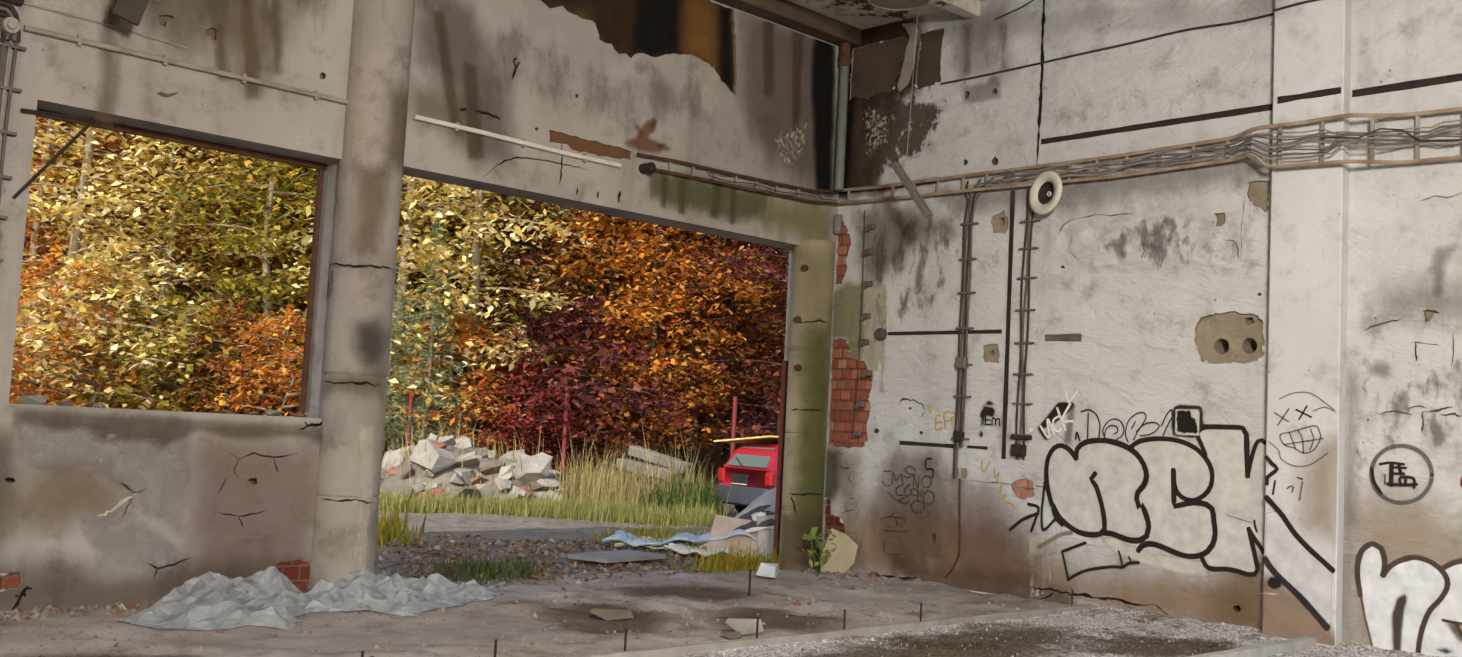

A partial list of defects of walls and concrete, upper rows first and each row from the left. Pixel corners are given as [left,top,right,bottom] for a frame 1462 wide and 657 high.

flaking render [541,0,737,95]
peeling [850,23,946,177]
flaking render [1193,310,1266,365]
crack [321,379,383,387]
flaking render [828,283,886,448]
crack [218,421,322,527]
crack [324,497,373,505]
flaking render [0,571,21,594]
crack [146,557,192,577]
flaking render [271,559,310,591]